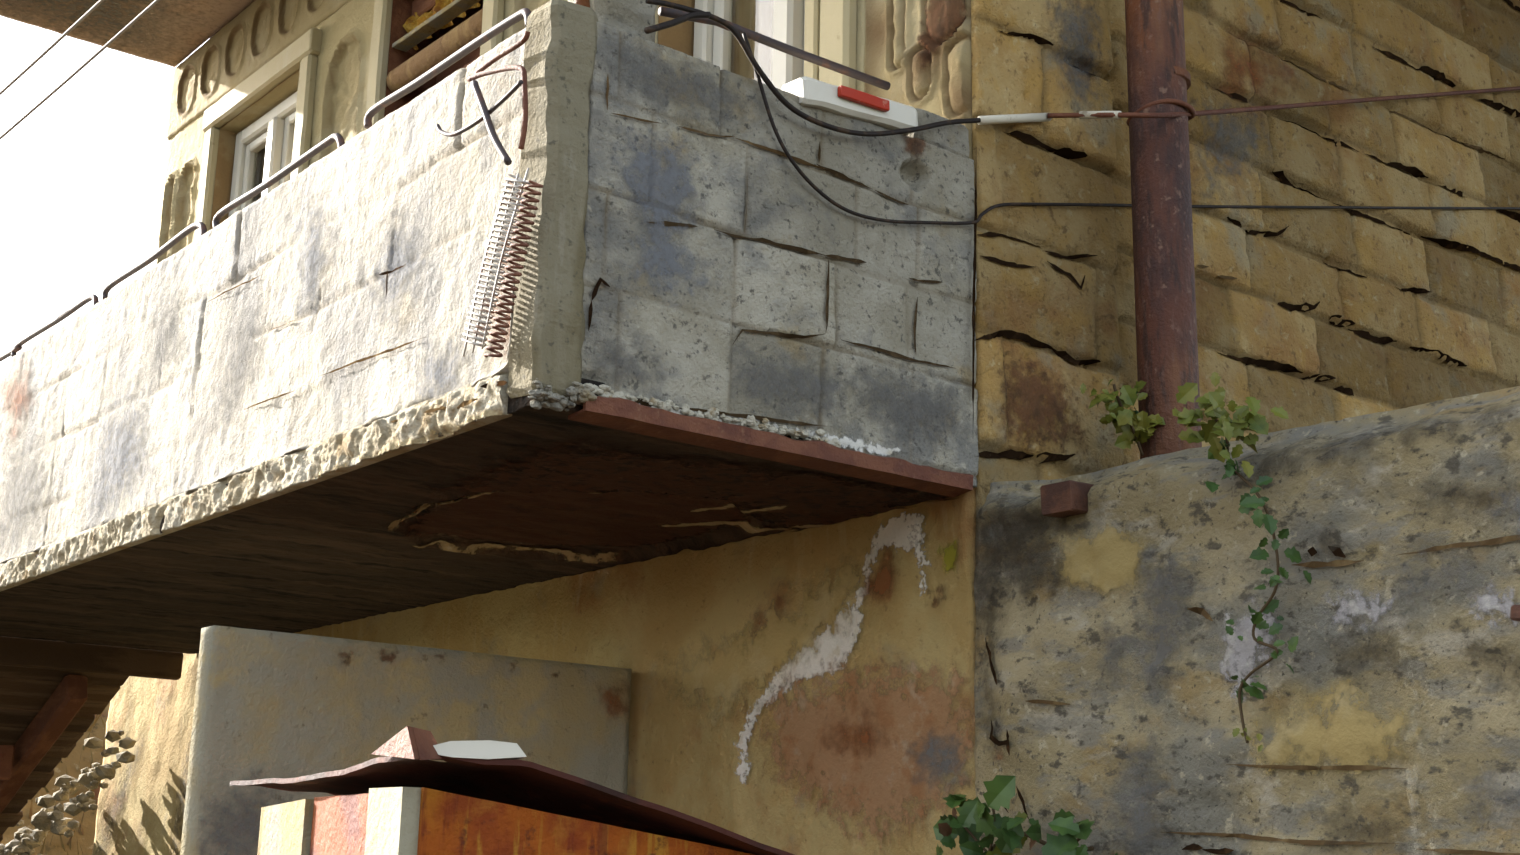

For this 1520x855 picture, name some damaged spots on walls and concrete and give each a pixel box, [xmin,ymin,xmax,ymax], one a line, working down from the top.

spalling [435,31,530,166]
damp [87,396,147,516]
spalling [528,378,597,412]
rust [431,440,955,532]
peeling [718,418,900,456]
damp [736,511,930,784]